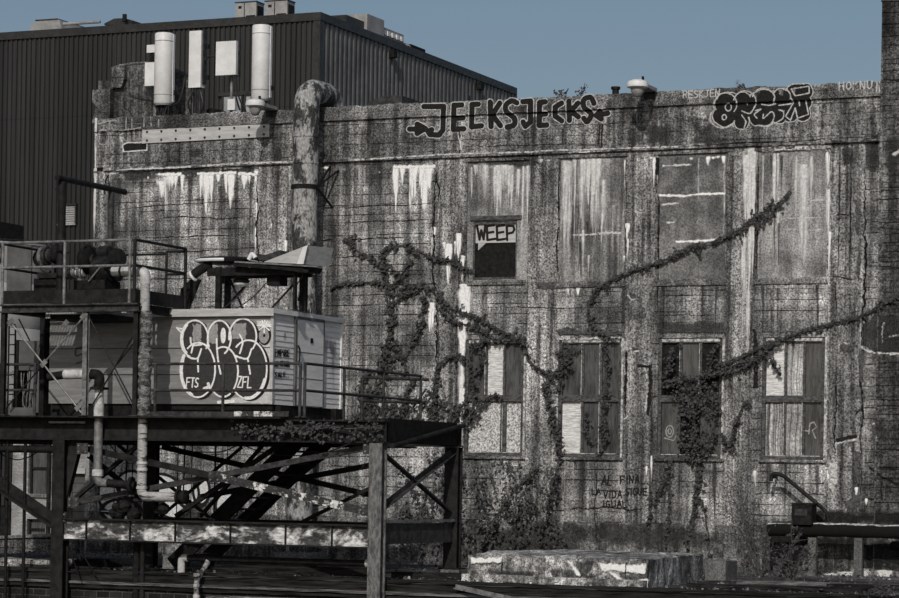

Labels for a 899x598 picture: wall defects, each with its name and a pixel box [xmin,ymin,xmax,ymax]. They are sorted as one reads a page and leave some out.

damp [93,118,105,228]
damp [109,166,258,248]
damp [392,164,436,212]
damp [471,155,550,240]
crack [320,137,851,371]
damp [563,151,615,271]
crack [785,164,899,502]